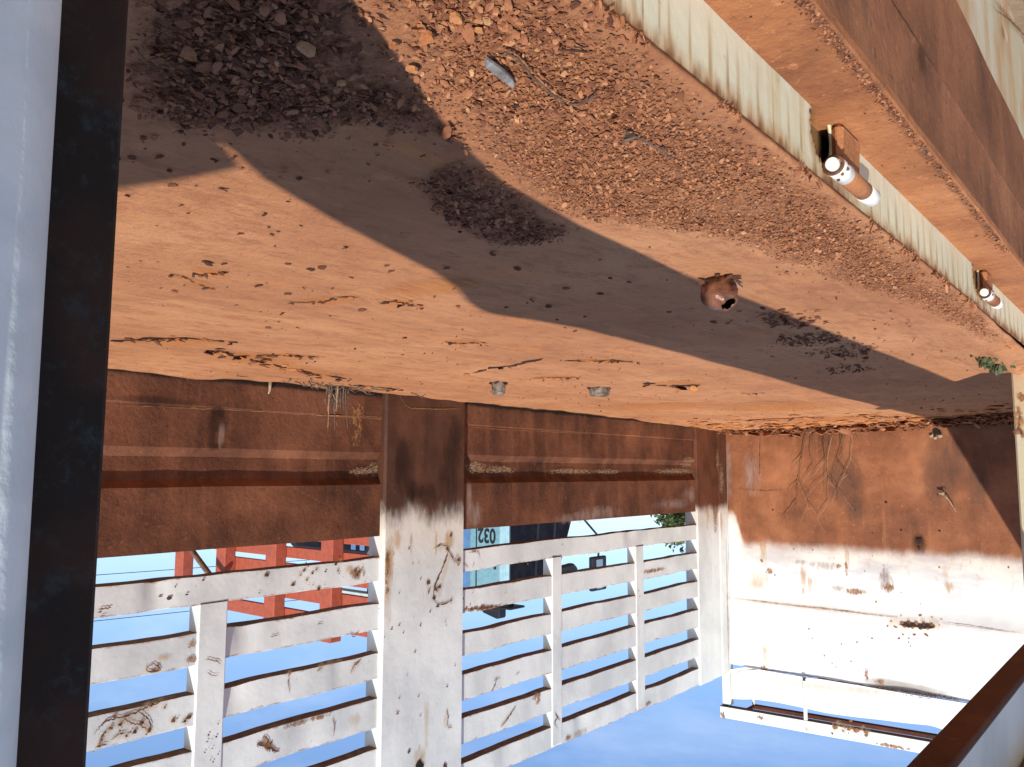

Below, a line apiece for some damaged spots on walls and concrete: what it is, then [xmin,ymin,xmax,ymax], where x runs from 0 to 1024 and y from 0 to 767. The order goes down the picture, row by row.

rust [747,416,840,429]
rust [291,556,366,590]